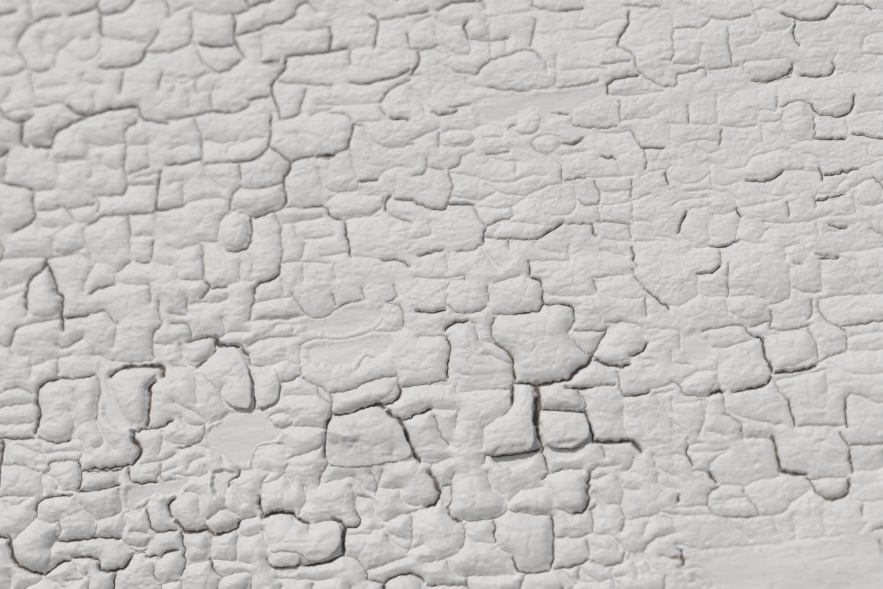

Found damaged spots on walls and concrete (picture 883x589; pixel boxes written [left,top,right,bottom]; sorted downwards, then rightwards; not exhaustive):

crack [0,0,583,321]
crack [360,0,883,317]
crack [0,242,310,589]
spalling [201,347,280,463]
crack [269,263,649,589]
crack [664,551,685,589]
crack [672,302,883,548]